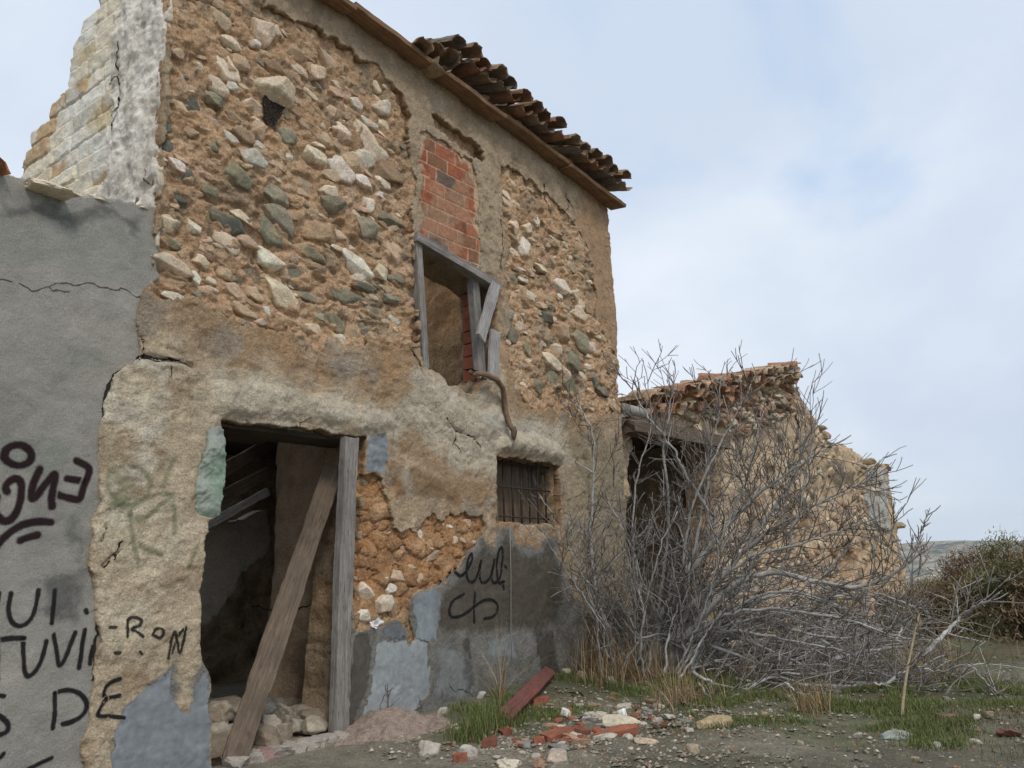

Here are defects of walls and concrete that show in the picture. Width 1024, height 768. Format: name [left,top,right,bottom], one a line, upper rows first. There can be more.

crack [109,42,120,130]
spalling [149,0,418,352]
crack [0,278,141,298]
spalling [500,167,621,426]
crack [102,338,191,417]
peeling [194,426,226,518]
spalling [352,433,483,716]
peeling [110,669,211,768]